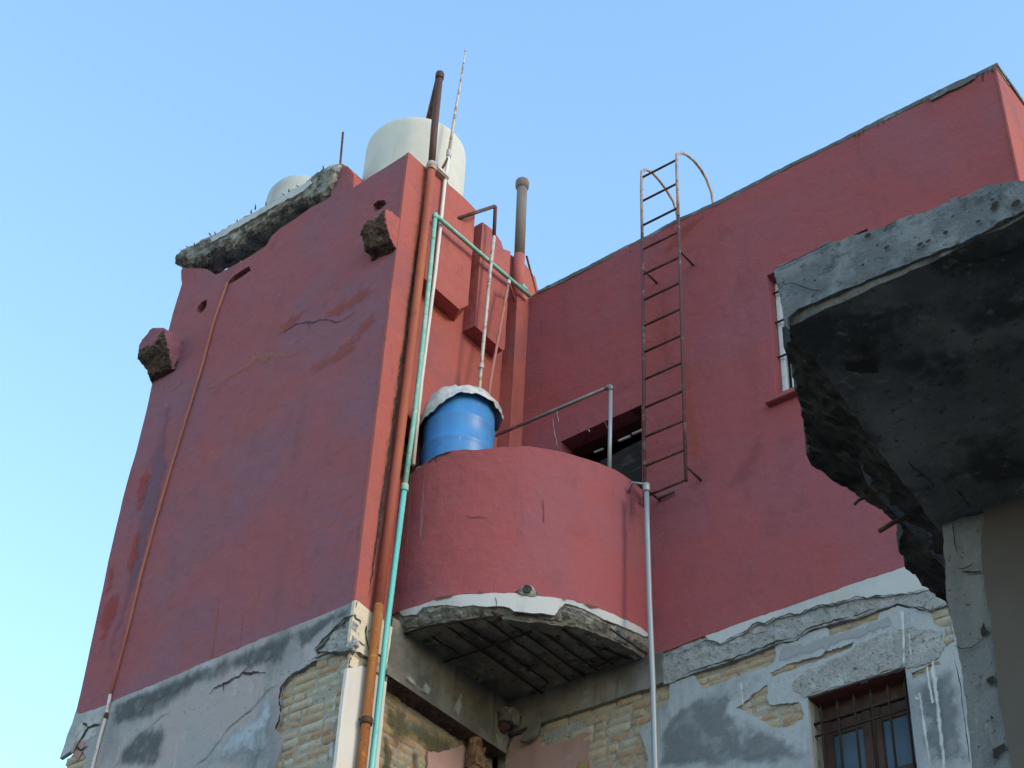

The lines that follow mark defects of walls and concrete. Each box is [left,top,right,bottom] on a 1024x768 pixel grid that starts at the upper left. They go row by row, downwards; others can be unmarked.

crack [286,312,354,331]
spalling [877,516,916,533]
crack [73,723,100,753]
damp [122,730,162,763]
crack [211,668,265,692]
flaking render [195,615,468,768]
spalling [404,611,648,703]
flaking render [505,685,670,768]
damp [662,696,792,764]
flaking render [684,609,890,728]
damp [915,661,959,765]
flaking render [931,607,954,647]